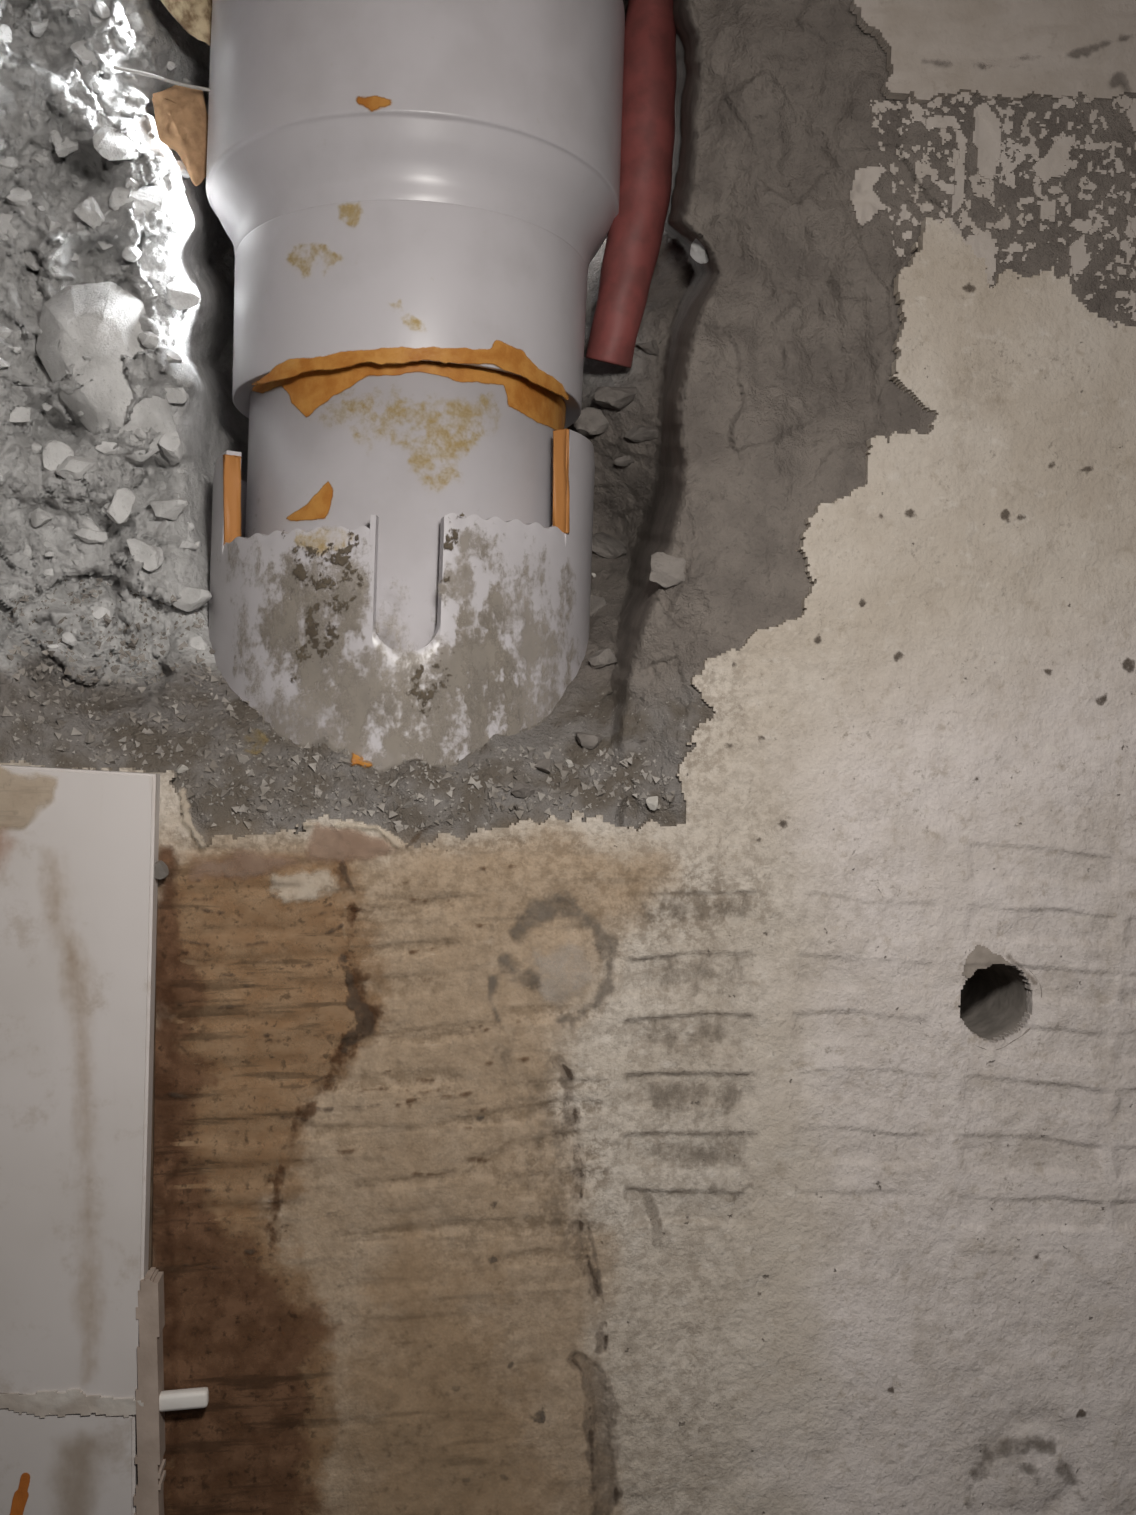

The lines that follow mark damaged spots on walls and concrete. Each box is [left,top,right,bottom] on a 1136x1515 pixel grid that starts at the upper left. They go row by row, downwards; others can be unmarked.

spalling [0,0,1136,901]
water stain [153,850,365,1515]